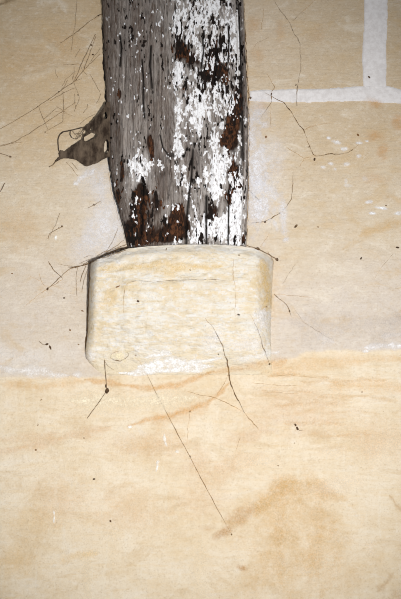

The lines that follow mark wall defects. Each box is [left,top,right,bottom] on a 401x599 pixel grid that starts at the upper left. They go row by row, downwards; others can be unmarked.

crack [100,9,108,119]
crack [106,139,125,238]
peeling [128,147,165,182]
peeling [171,0,286,246]
crack [201,2,357,247]
crack [188,318,259,430]
crack [140,362,232,535]